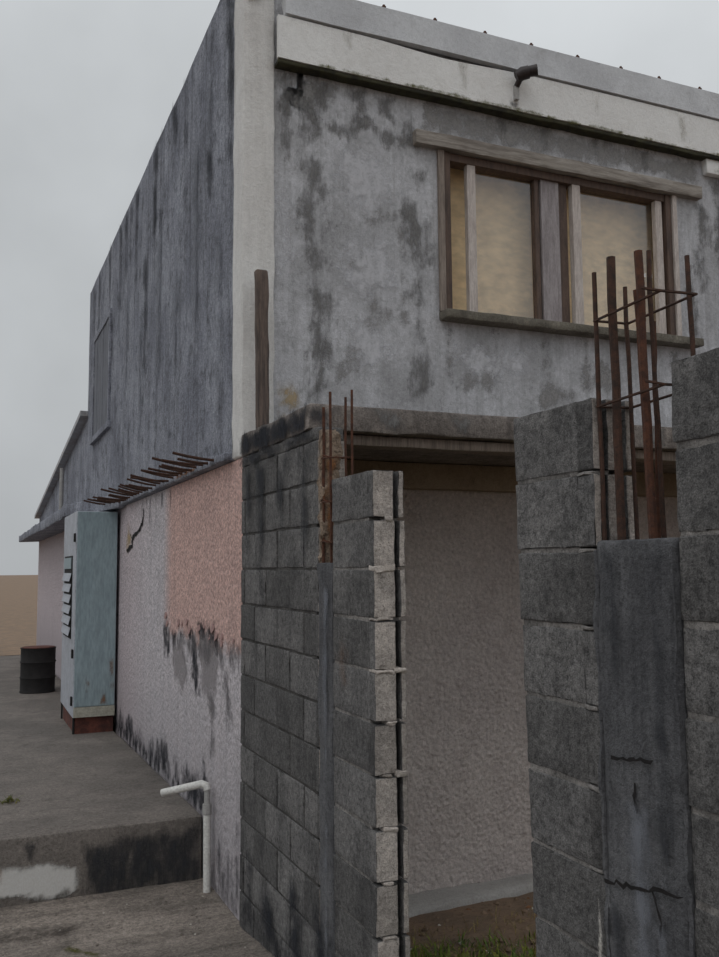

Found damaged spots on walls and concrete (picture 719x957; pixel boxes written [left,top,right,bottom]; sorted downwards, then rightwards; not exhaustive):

leakage [275,72,414,146]
leakage [299,157,325,267]
leakage [398,203,433,265]
leakage [94,145,161,405]
leakage [310,286,332,391]
leakage [583,358,612,391]
crack [126,510,144,553]
leakage [115,711,205,811]
leakage [86,829,199,894]
crack [604,878,683,939]